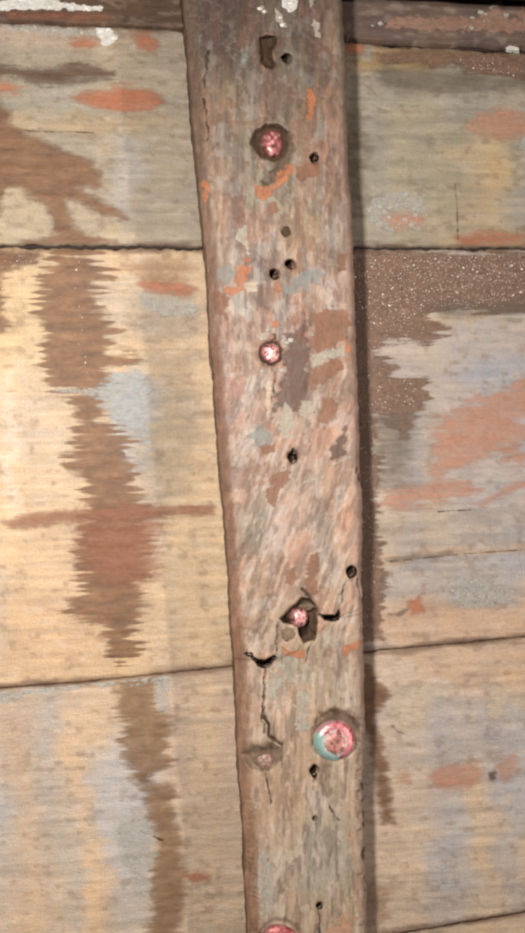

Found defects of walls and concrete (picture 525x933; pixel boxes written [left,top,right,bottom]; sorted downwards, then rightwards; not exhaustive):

crack [306,579,358,651]
crack [244,649,282,745]